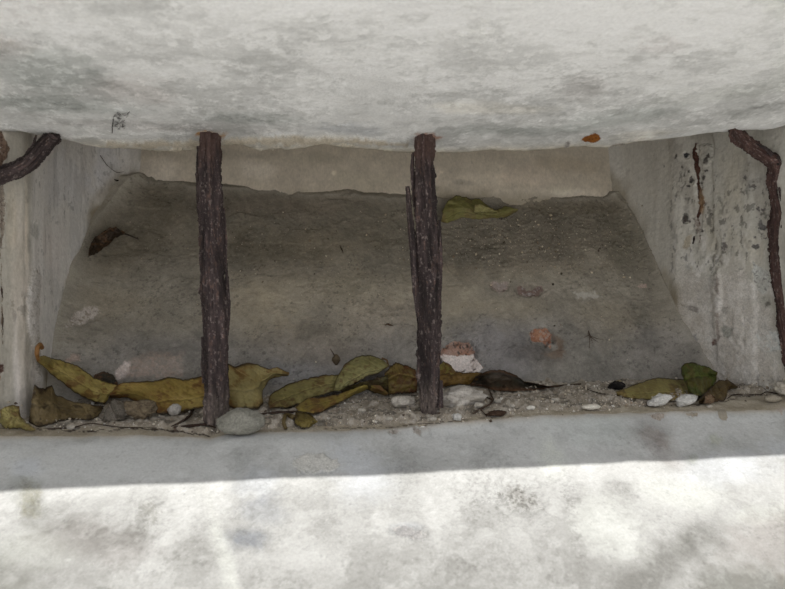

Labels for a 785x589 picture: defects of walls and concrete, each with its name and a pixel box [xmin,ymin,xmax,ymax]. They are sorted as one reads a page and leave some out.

crack [0,131,10,166]
rust [571,129,612,146]
crack [0,185,8,349]
spalling [440,340,484,373]